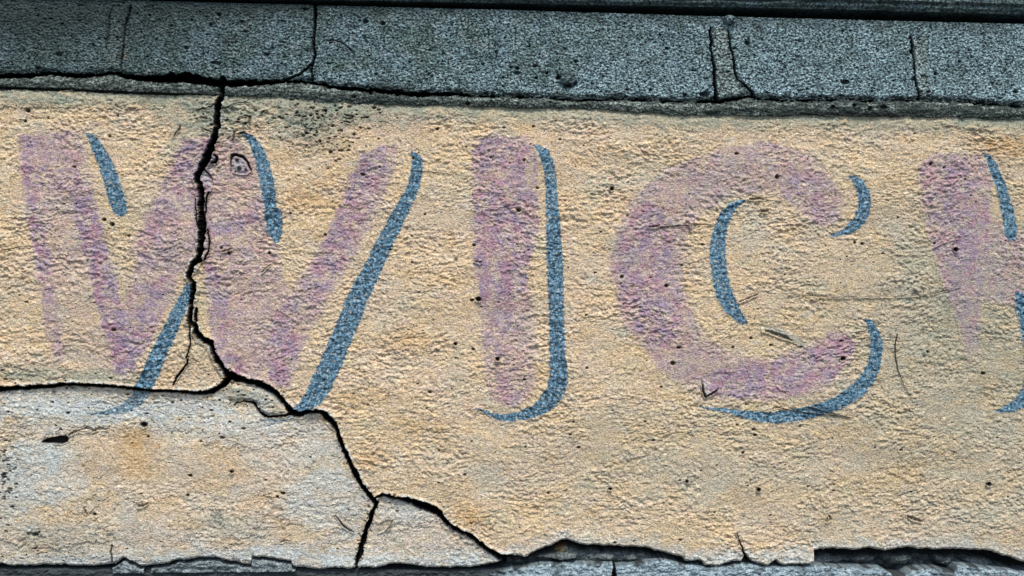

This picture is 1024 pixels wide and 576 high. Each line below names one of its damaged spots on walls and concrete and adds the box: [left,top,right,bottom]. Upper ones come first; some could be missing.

crack [390,26,1024,109]
crack [0,4,528,568]
spalling [41,425,108,445]
peeling [377,519,393,534]
spalling [112,556,296,573]
spalling [503,539,673,563]
spalling [814,546,1024,567]